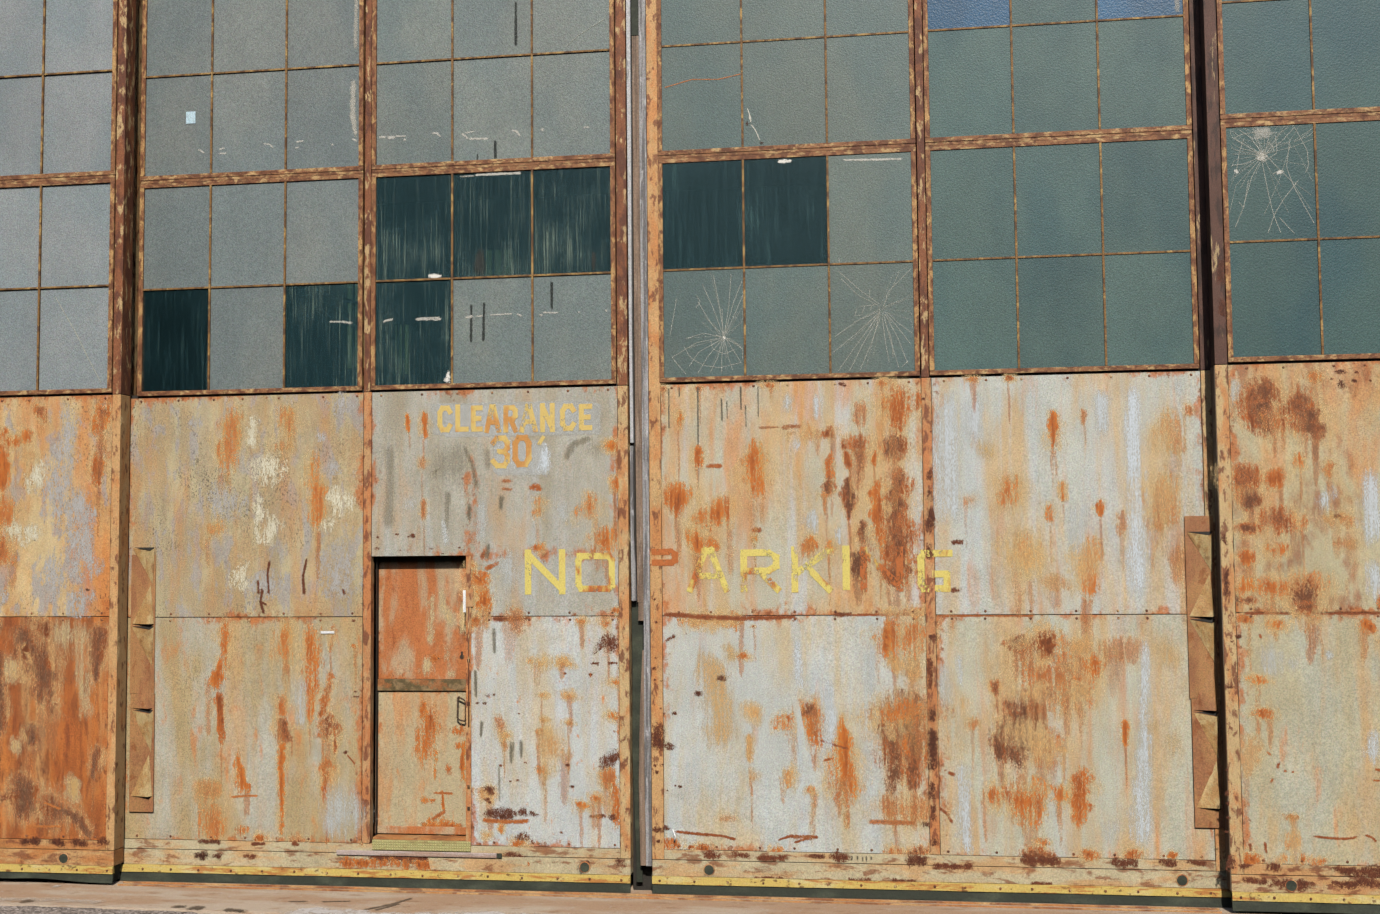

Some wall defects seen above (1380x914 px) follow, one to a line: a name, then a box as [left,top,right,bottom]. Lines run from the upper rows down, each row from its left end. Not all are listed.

peeling [2,400,106,621]
corrosion [655,377,936,587]
corrosion [1220,369,1380,643]
corrosion [652,598,795,642]
corrosion [195,619,355,861]
corrosion [339,843,434,871]
corrosion [415,693,539,866]
corrosion [598,748,620,828]
corrosion [651,708,677,774]
corrosion [743,605,1106,885]
corrosion [1079,848,1207,869]
corrosion [1225,813,1380,892]